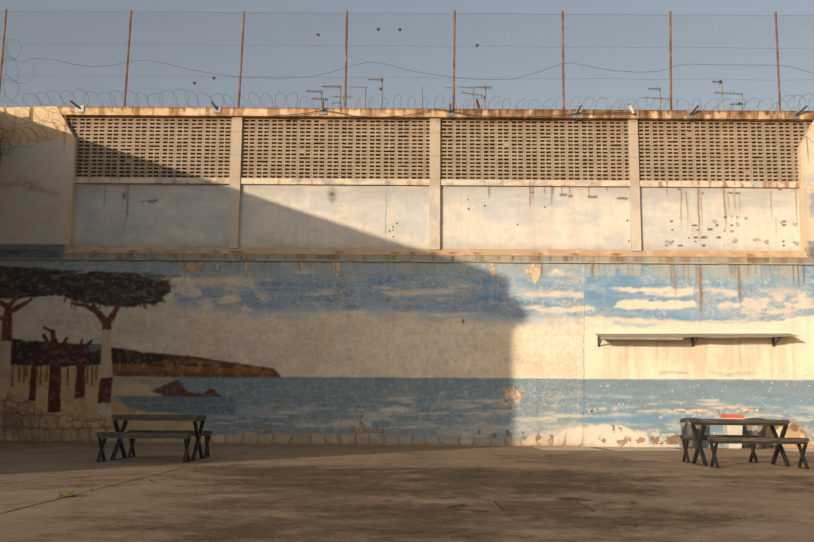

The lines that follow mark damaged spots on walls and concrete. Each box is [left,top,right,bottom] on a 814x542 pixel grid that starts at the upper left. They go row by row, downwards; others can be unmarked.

peeling [525,263,542,284]
flaking render [0,391,577,447]
spalling [612,425,683,446]